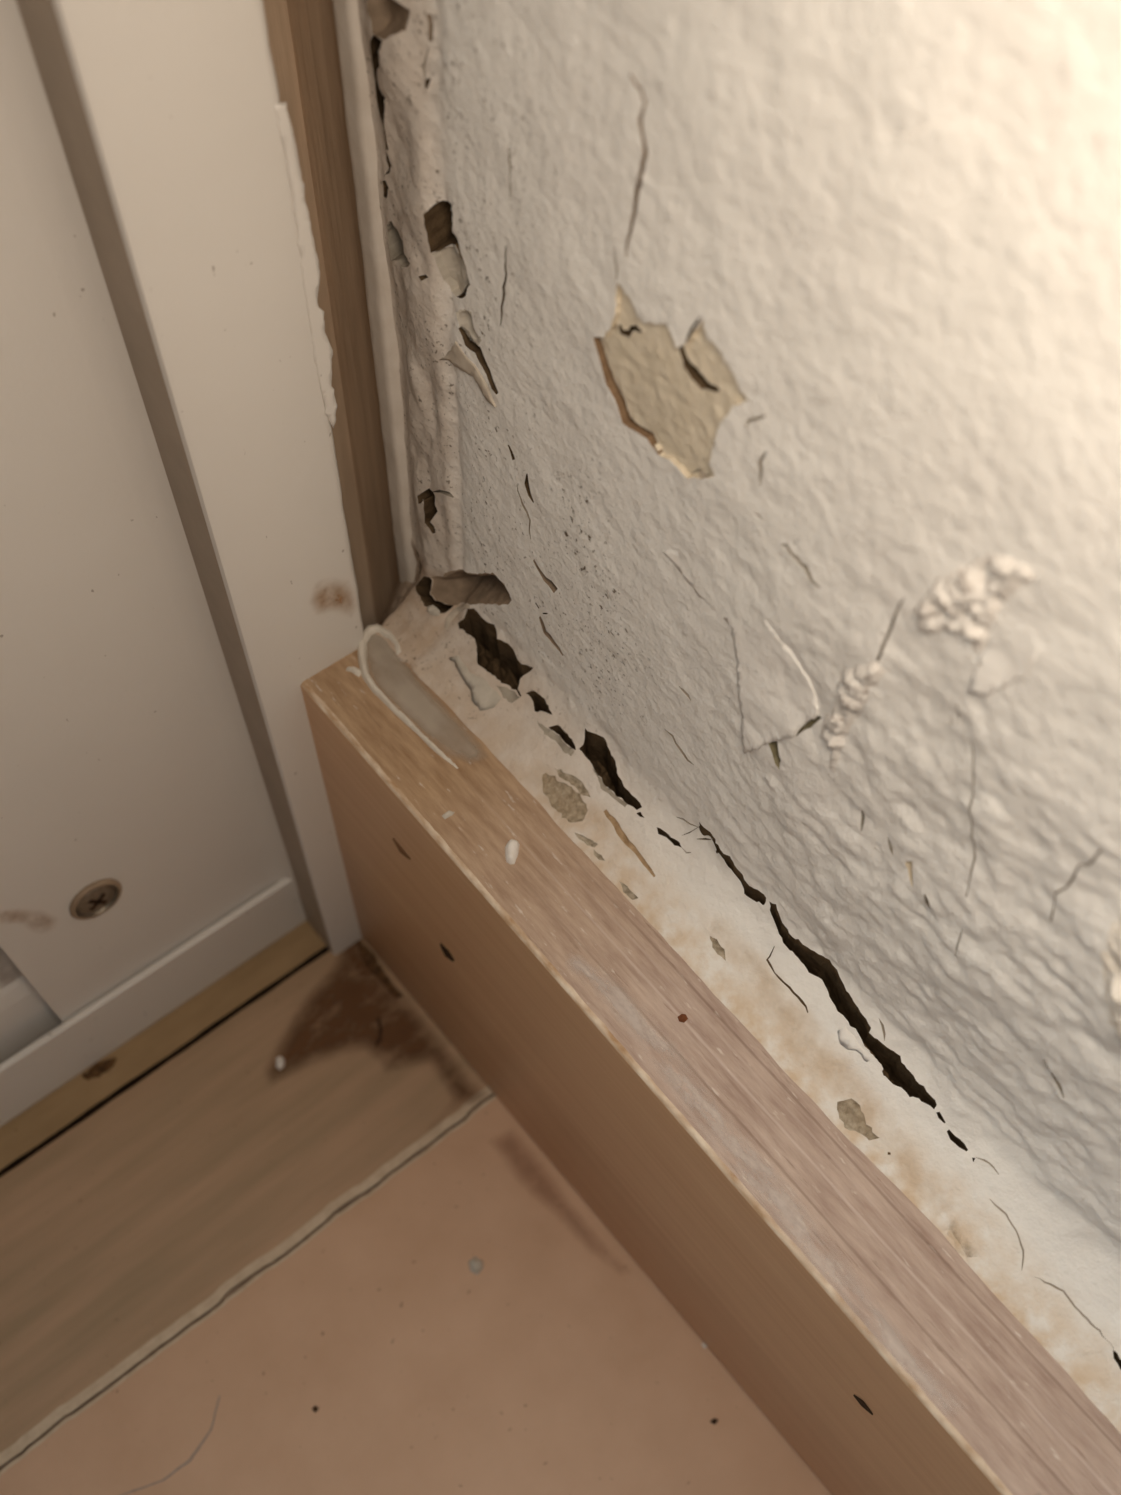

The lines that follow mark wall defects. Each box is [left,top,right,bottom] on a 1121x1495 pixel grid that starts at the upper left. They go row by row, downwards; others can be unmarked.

spalling [367,0,410,198]
crack [614,73,647,282]
spalling [387,200,498,407]
peeling [593,283,749,480]
spalling [416,550,511,630]
crack [508,445,563,656]
crack [876,599,904,662]
spalling [914,553,1038,697]
crack [666,730,694,765]
crack [950,706,976,953]
leakage [274,943,472,1097]
crack [677,811,1121,1369]